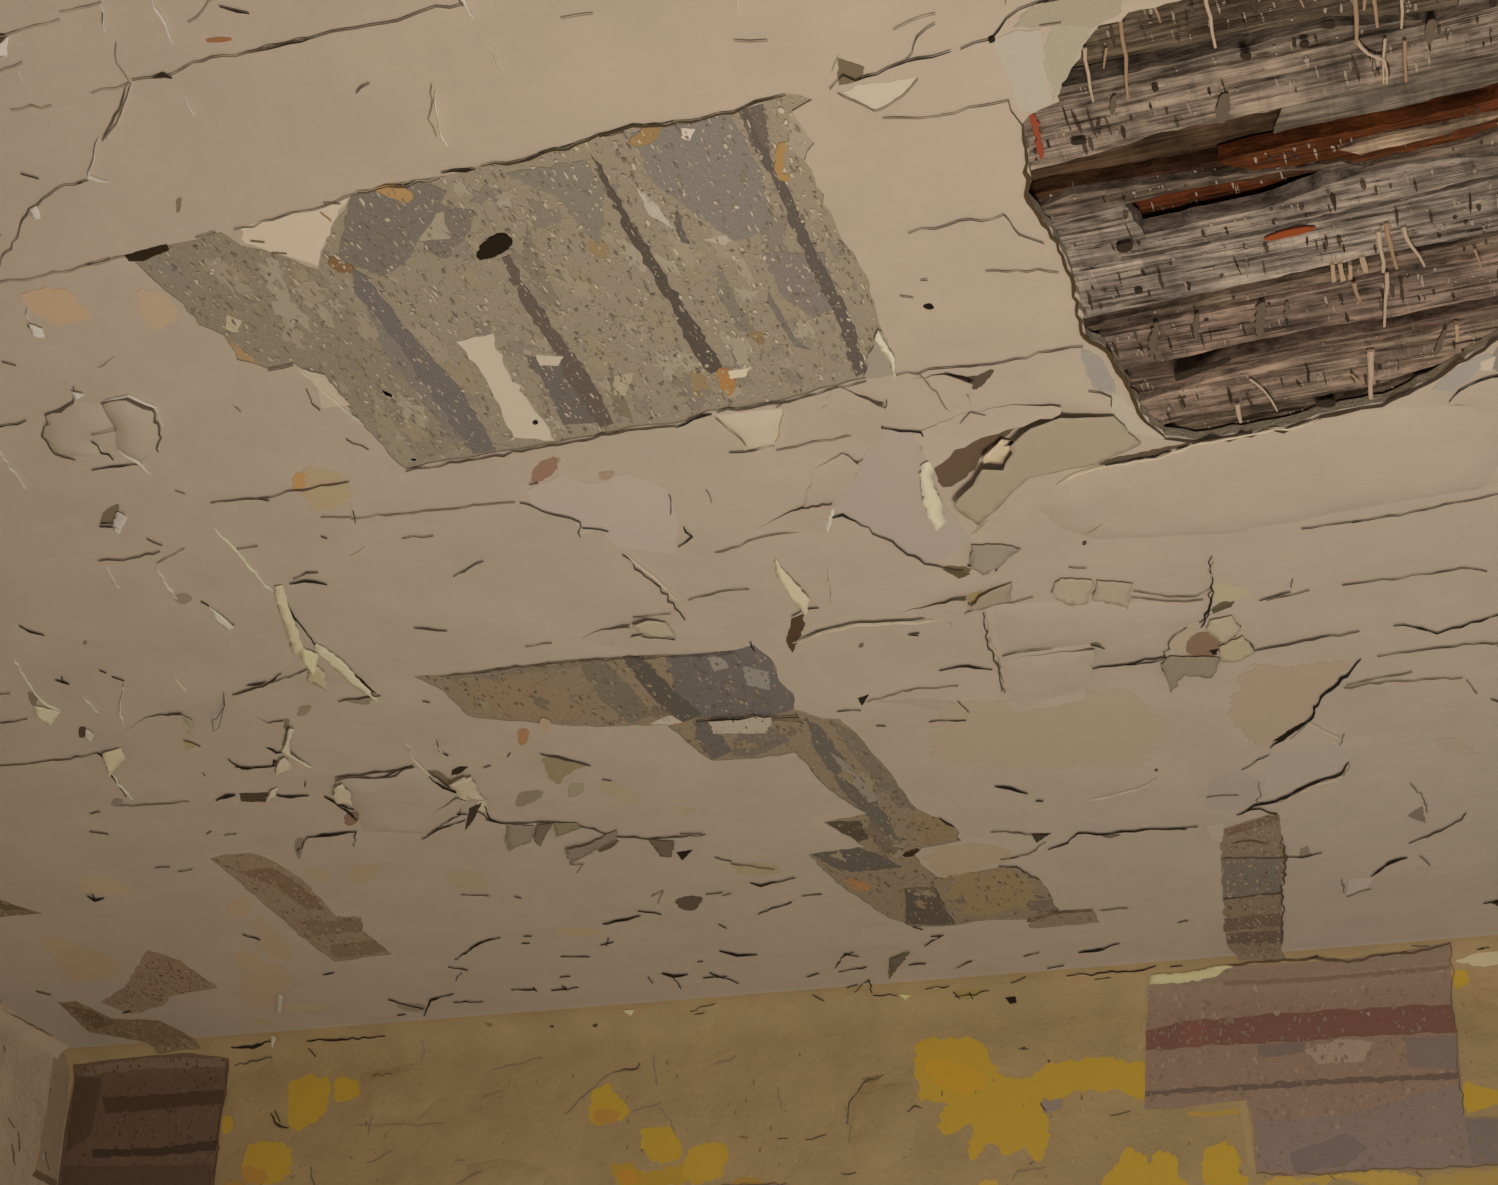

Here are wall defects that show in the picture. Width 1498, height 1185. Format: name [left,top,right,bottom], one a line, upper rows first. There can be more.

crack [0,3,102,73]
spalling [994,0,1123,112]
crack [0,387,162,471]
spalling [236,92,1336,667]
crack [175,0,1498,727]
spalling [1432,347,1498,391]
crack [98,522,185,564]
spalling [405,621,1098,927]
crack [807,557,1498,1115]
spalling [36,1052,233,1185]
peeling [609,1126,786,1185]
spalling [913,941,1498,1185]